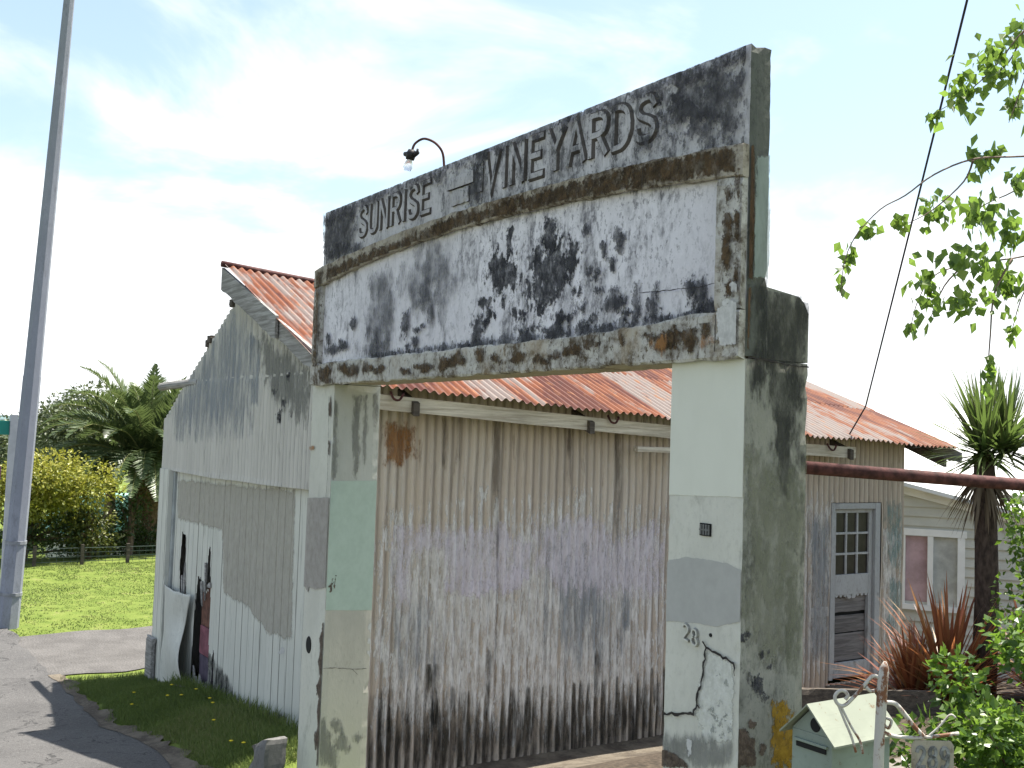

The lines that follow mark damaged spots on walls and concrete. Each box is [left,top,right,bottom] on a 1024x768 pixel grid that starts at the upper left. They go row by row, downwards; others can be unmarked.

mould [324,238,456,357]
mould [468,216,670,347]
mould [680,274,717,314]
damp [176,318,311,432]
damp [751,279,809,499]
rust [385,422,417,467]
damp [320,664,732,768]
crack [662,641,735,717]
mould [747,649,772,702]